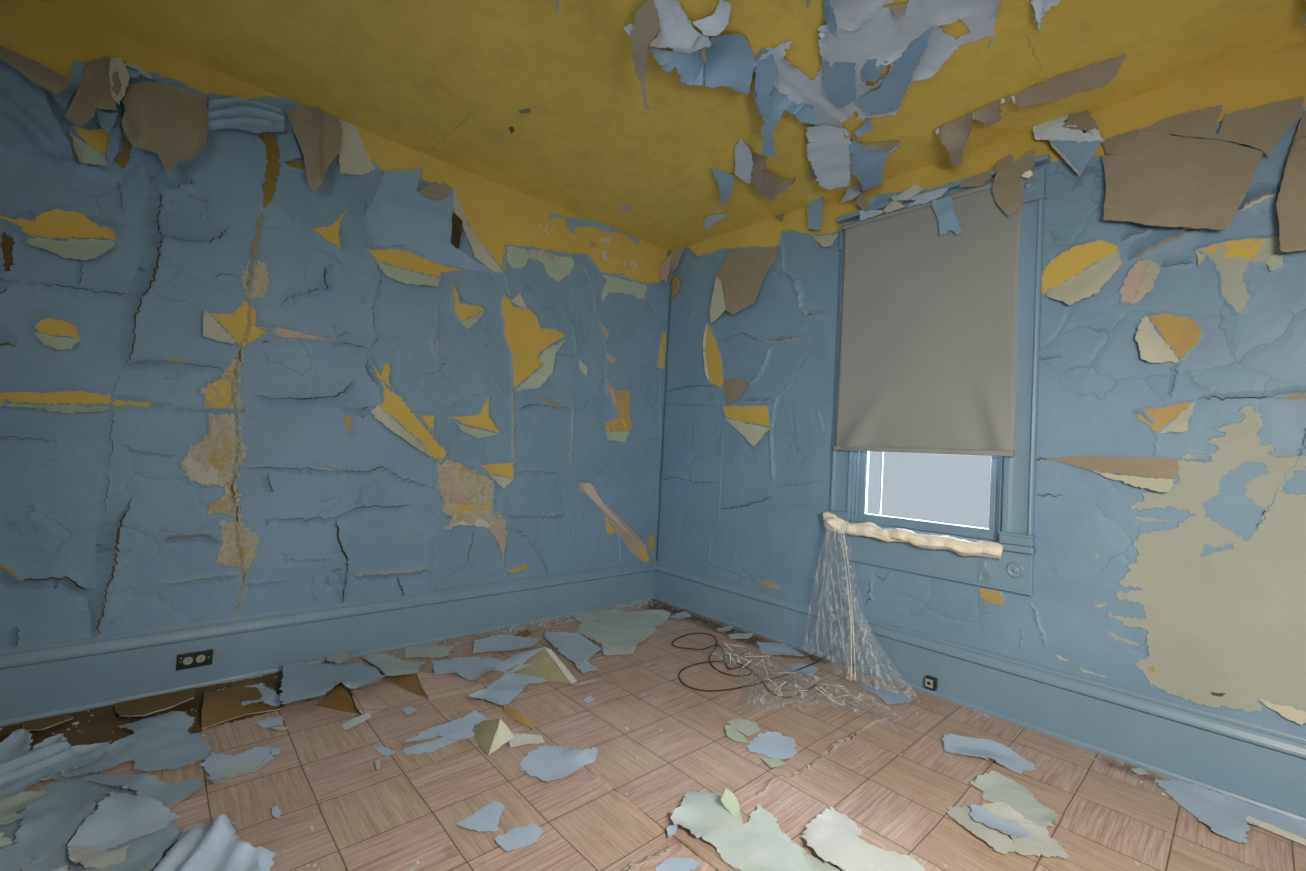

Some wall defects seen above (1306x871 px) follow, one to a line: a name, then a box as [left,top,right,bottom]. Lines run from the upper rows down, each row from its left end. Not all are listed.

flaking render [0,0,301,106]
peeling [357,0,1126,303]
flaking render [1082,40,1306,165]
crack [0,142,436,638]
flaking render [604,379,634,442]
crack [1166,361,1306,536]
flaking render [434,457,510,581]
flaking render [1094,404,1306,725]
crack [8,626,25,648]